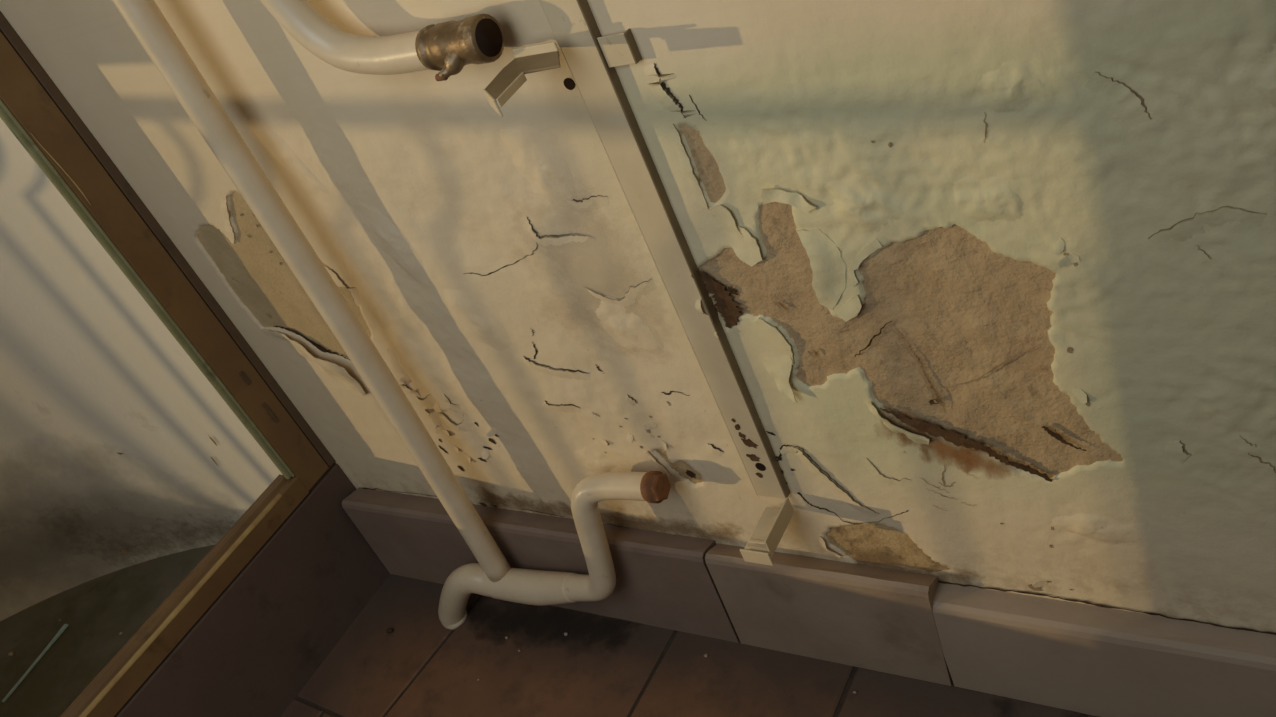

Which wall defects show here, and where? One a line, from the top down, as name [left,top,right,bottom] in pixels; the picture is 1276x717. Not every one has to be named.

crack [463,195,610,276]
peeling [197,191,371,396]
peeling [673,124,1123,482]
peeling [387,348,498,471]
crack [523,328,602,417]
crack [625,391,689,406]
crack [777,445,977,525]
spalling [819,523,949,572]
water stain [468,606,627,645]